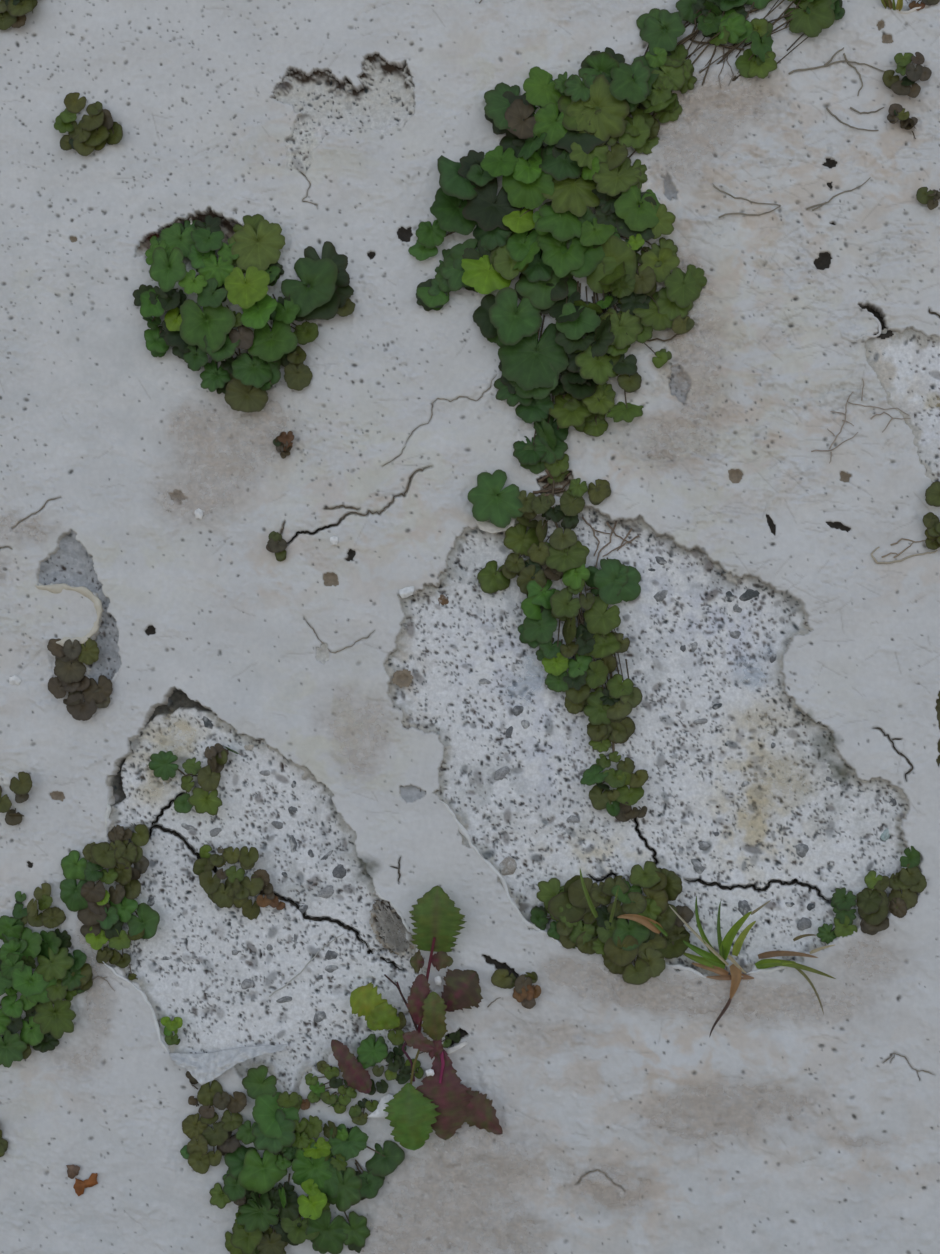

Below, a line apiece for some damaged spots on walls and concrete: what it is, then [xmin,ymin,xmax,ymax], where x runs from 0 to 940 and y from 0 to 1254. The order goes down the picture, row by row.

spalling [272,54,416,175]
crack [280,376,496,544]
spalling [839,306,940,483]
spalling [35,530,122,684]
spalling [384,507,921,978]
spalling [100,688,442,1094]
crack [149,792,403,970]
crack [634,818,658,864]
crack [684,879,829,901]
spalling [368,1094,394,1118]